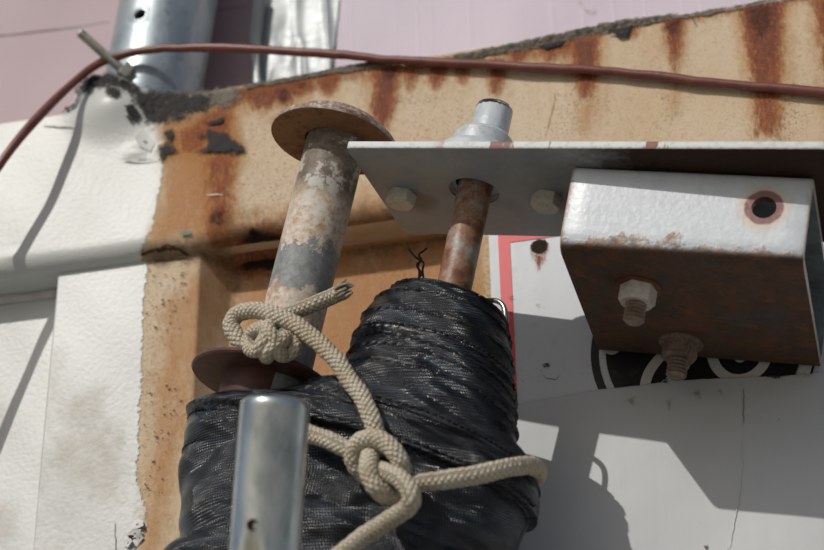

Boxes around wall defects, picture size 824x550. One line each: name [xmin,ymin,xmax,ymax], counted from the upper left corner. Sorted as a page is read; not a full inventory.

rust [489,32,601,98]
rust [661,0,795,136]
rust [811,0,824,65]
peeling [122,129,178,163]
peeling [197,116,246,154]
rust [165,64,446,303]
rust [322,234,447,356]
rust [313,354,335,375]